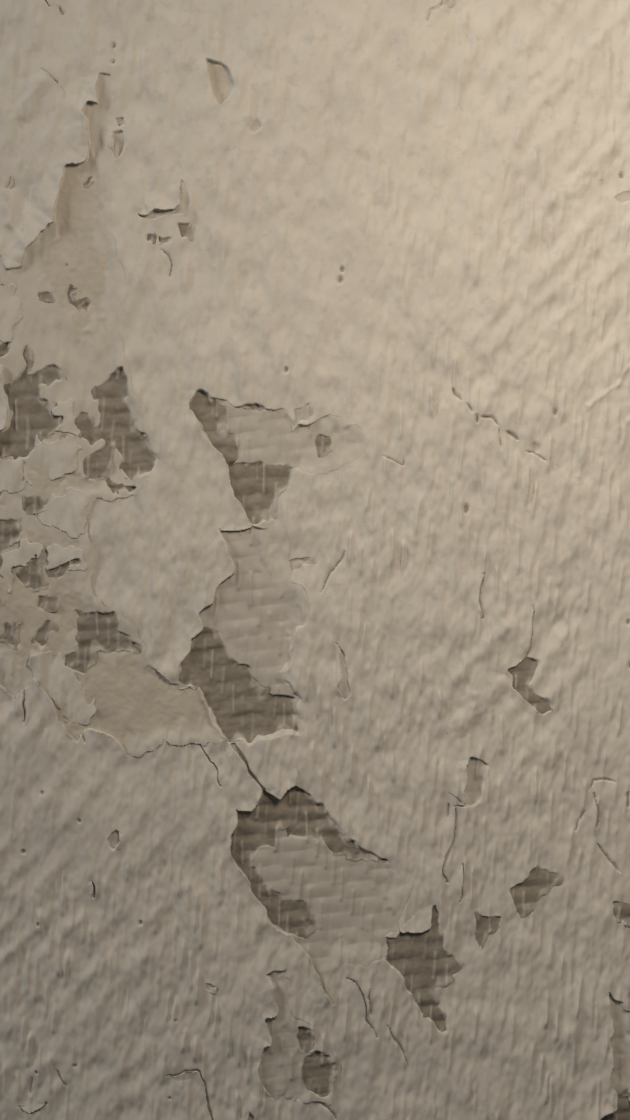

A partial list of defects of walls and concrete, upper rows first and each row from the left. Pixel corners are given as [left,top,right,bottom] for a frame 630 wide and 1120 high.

peeling [0,61,464,1105]
peeling [498,656,553,715]
peeling [475,911,501,949]
peeling [510,865,563,917]
peeling [613,902,630,927]
peeling [570,993,630,1120]